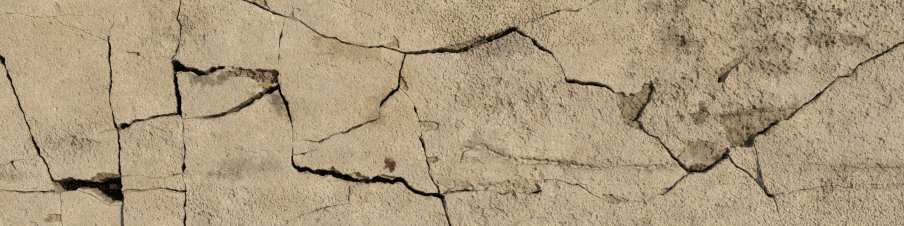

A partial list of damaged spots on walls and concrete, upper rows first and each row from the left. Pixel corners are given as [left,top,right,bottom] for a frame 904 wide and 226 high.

crack [0,0,616,226]
spalling [615,83,654,130]
spalling [688,106,799,173]
crack [622,41,904,226]